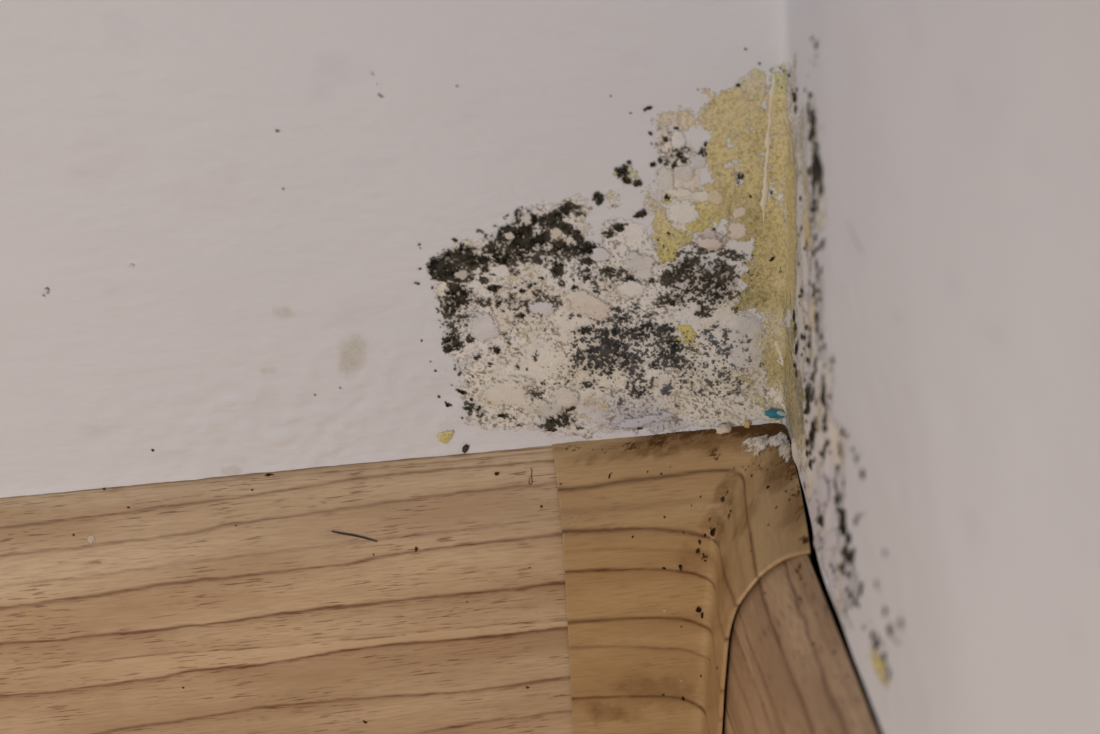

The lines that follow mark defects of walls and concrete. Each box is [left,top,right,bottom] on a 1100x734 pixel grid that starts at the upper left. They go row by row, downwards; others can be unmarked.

leakage [414,36,864,617]
peeling [765,409,786,419]
leakage [863,606,902,690]